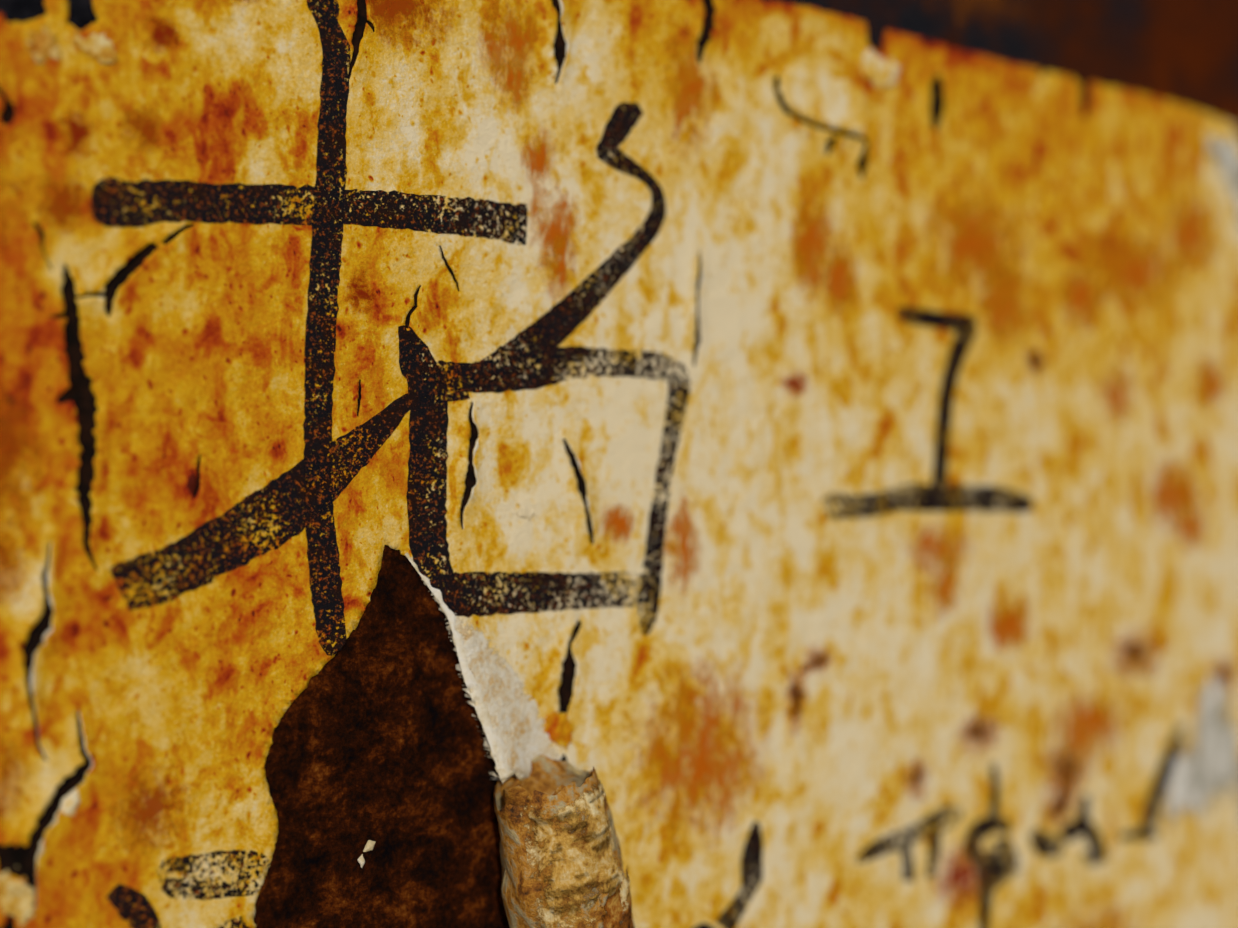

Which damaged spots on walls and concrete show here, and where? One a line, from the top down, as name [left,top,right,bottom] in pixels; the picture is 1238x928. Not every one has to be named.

peeling [0,0,118,65]
crack [349,0,375,79]
corrosion [482,0,536,105]
crack [552,0,569,84]
corrosion [523,133,575,291]
corrosion [793,202,857,312]
crack [32,222,194,571]
corrosion [603,507,633,541]
corrosion [665,498,697,590]
crack [0,543,94,928]
peeling [543,711,574,748]
peeling [357,840,376,868]